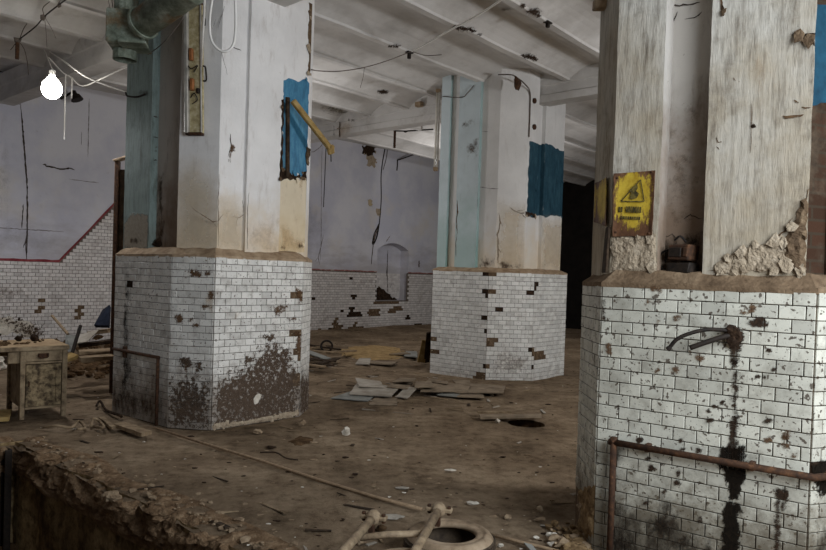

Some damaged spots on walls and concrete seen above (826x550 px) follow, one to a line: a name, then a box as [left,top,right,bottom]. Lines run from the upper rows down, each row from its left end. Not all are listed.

crack [674,2,701,21]
peeling [278,3,312,253]
spalling [289,286,422,337]
peeling [481,307,503,347]
peeling [473,364,490,380]
peeling [528,347,546,370]
rust [764,430,797,458]
water stain [812,460,826,498]
rust [773,488,790,550]